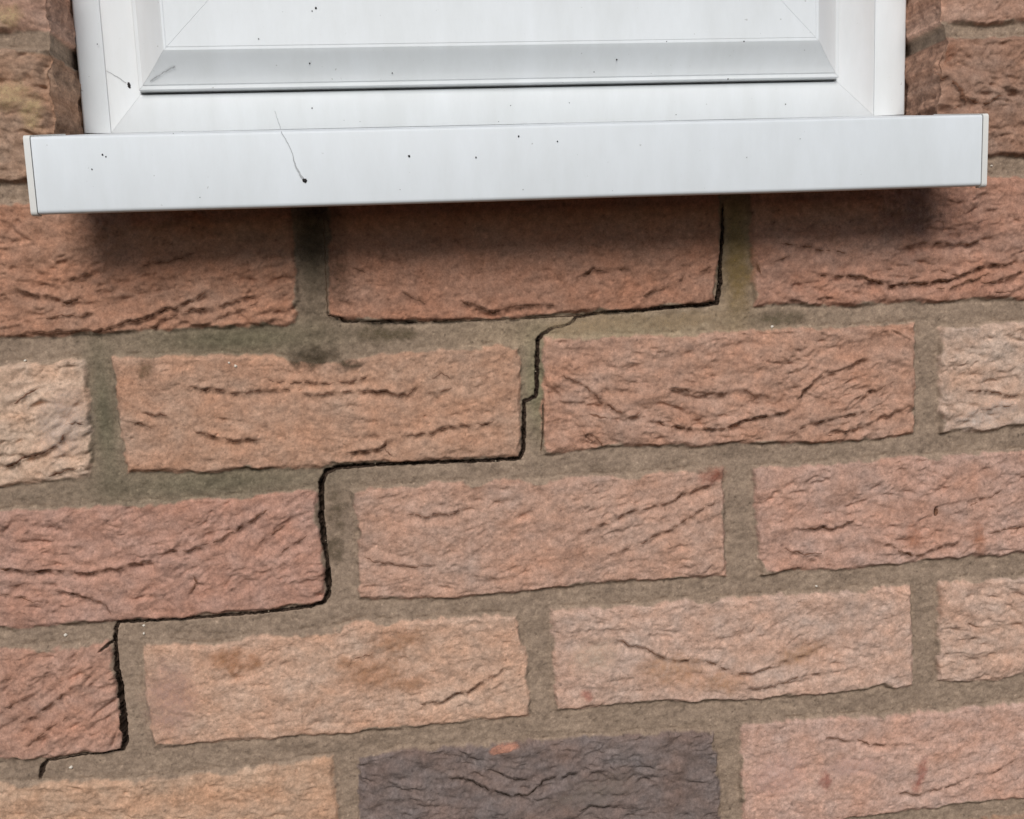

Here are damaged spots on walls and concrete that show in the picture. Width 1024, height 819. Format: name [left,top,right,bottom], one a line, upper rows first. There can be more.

crack [0,207,724,780]
crack [622,640,820,690]